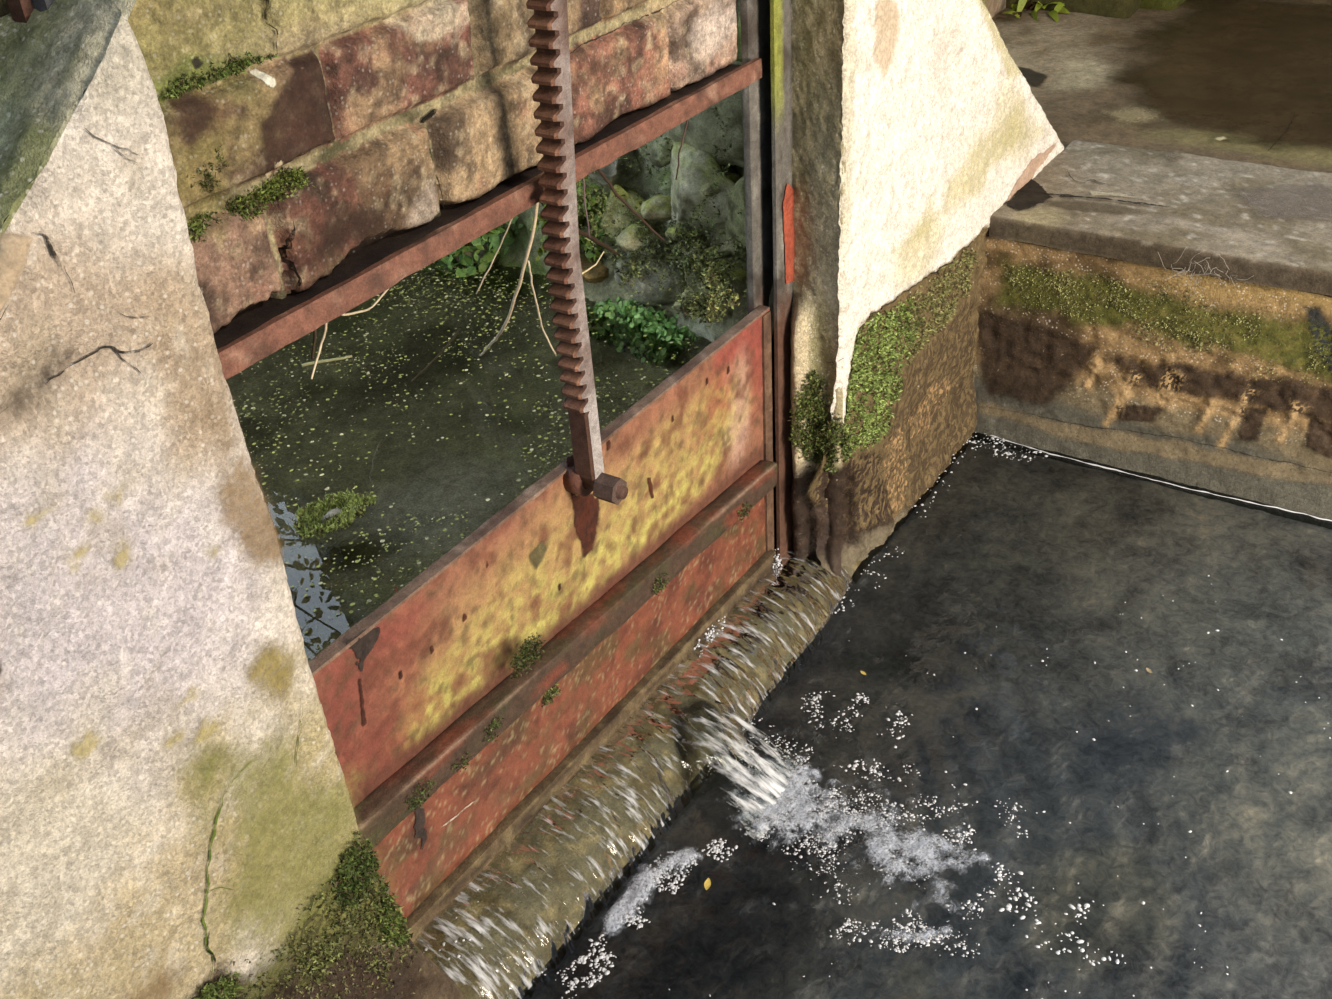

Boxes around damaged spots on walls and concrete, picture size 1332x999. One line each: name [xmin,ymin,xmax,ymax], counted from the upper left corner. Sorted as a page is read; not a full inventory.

crack [85,128,138,163]
crack [40,233,75,292]
crack [47,312,153,383]
corrosion [530,543,547,569]
corrosion [571,493,599,557]
crack [202,759,253,976]